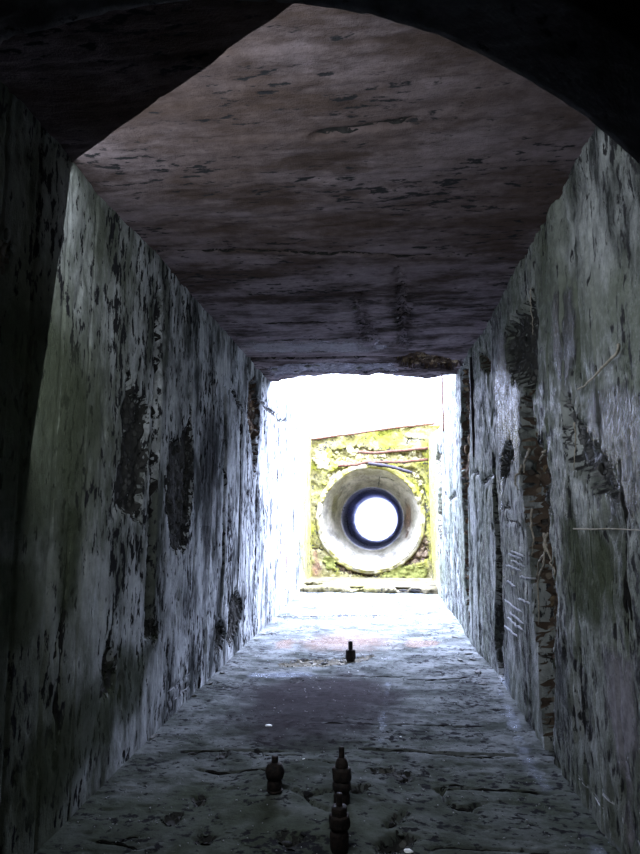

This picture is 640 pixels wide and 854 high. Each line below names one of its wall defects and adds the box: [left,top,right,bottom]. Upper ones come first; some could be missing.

spalling [562,393,619,498]
damp [506,550,536,587]
damp [504,598,530,637]
spalling [375,811,421,854]